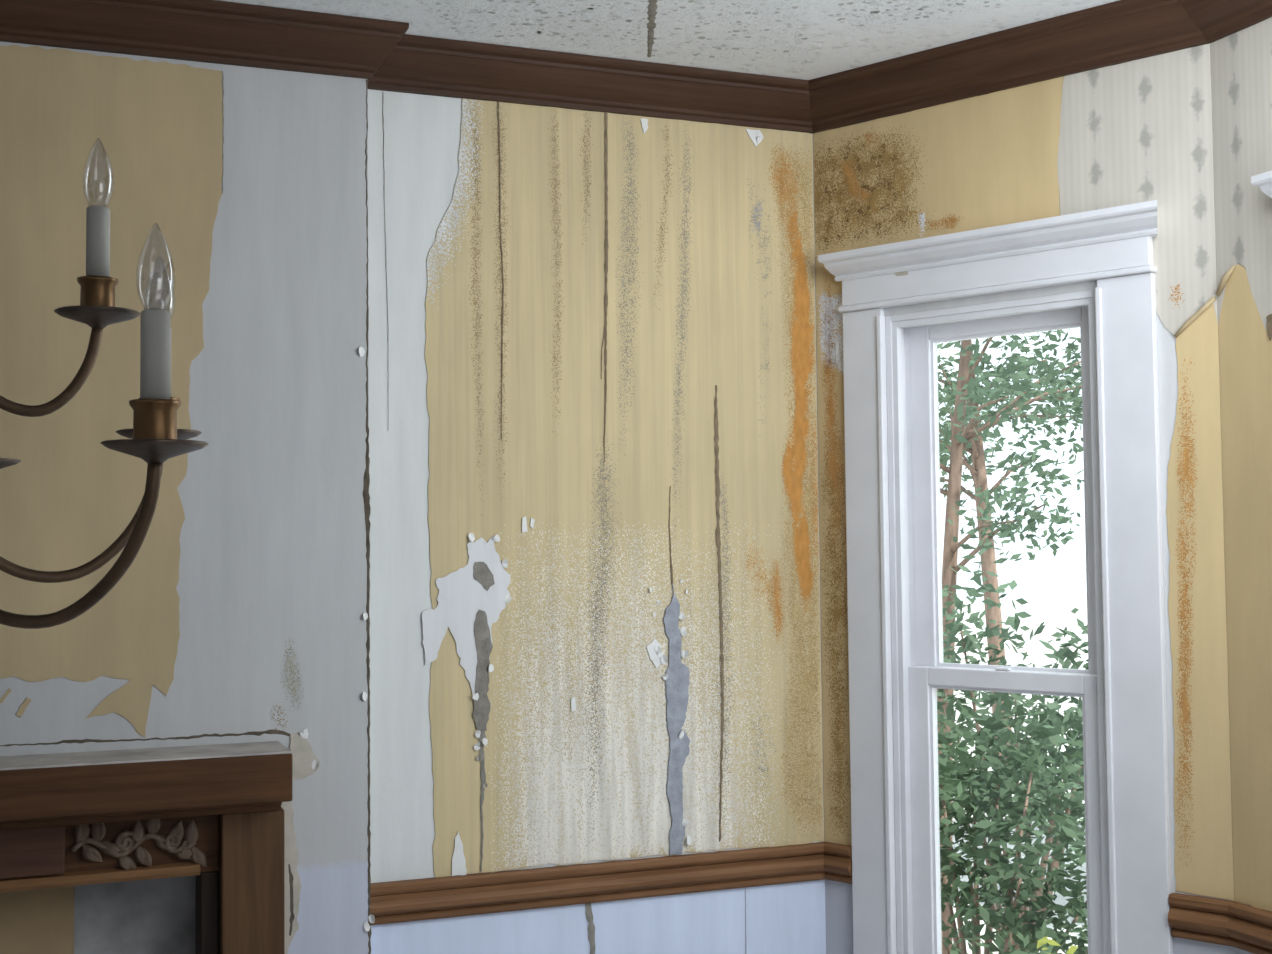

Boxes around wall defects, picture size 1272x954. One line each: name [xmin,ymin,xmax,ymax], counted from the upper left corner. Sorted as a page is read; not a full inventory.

damp [422,0,813,62]
damp [828,0,1001,34]
damp [485,110,965,871]
peeling [422,533,512,751]
spalling [647,579,692,855]
crack [585,903,596,954]